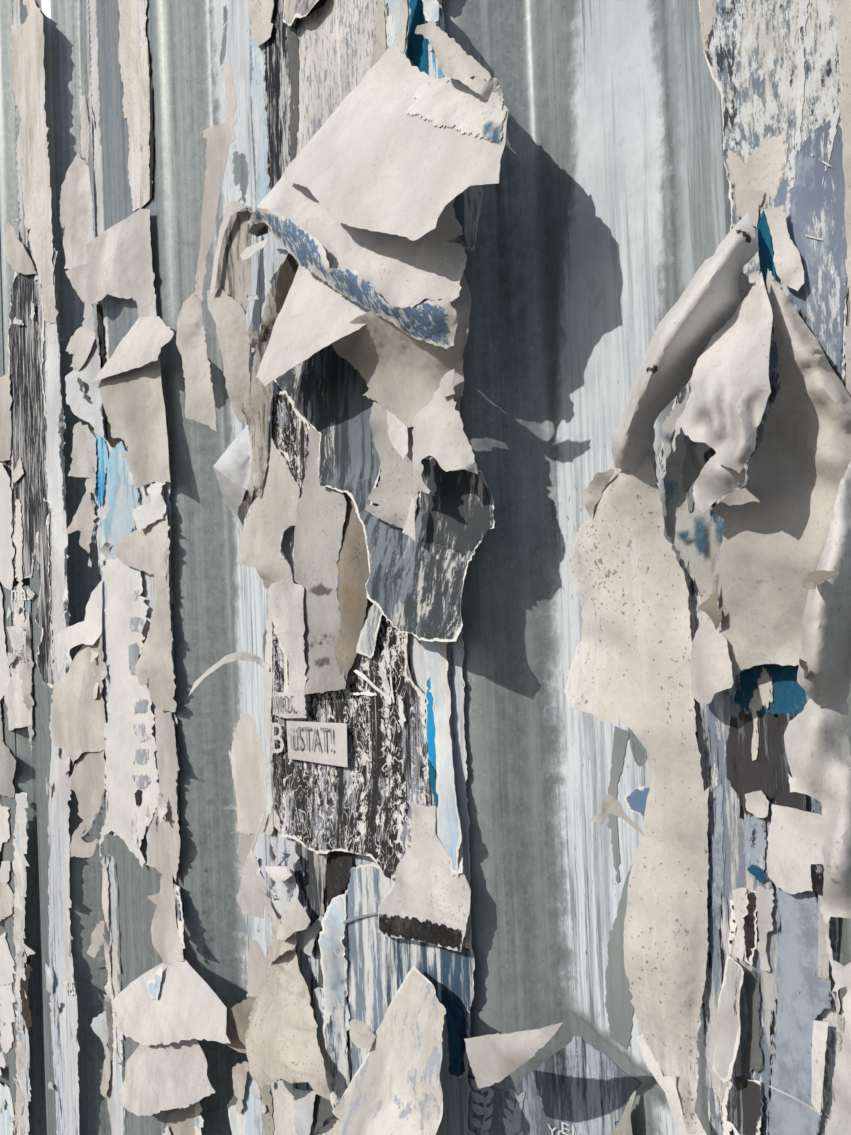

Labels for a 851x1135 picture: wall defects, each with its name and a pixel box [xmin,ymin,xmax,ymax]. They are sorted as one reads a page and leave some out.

peeling [188,651,270,697]
peeling [608,726,629,799]
peeling [604,813,634,1049]